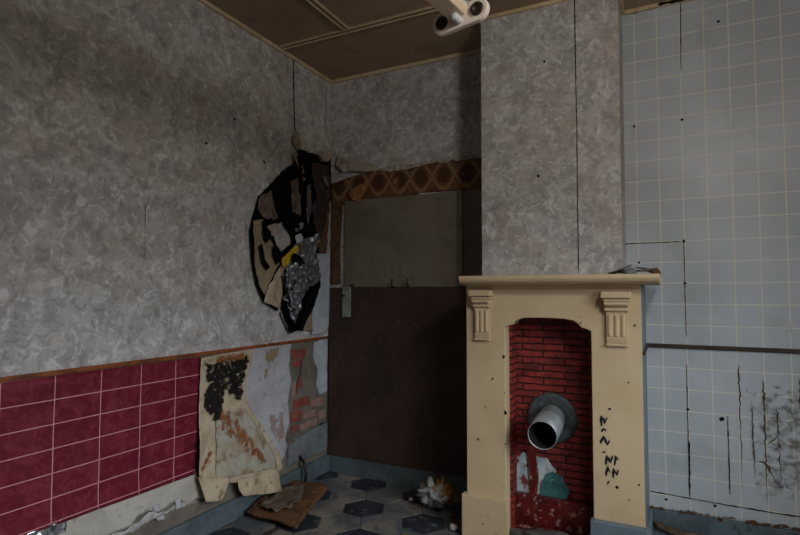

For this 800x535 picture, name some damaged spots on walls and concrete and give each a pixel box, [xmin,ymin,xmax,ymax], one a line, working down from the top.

flaking render [275,339,328,467]
leakage [751,381,800,489]
flaking render [58,470,204,535]